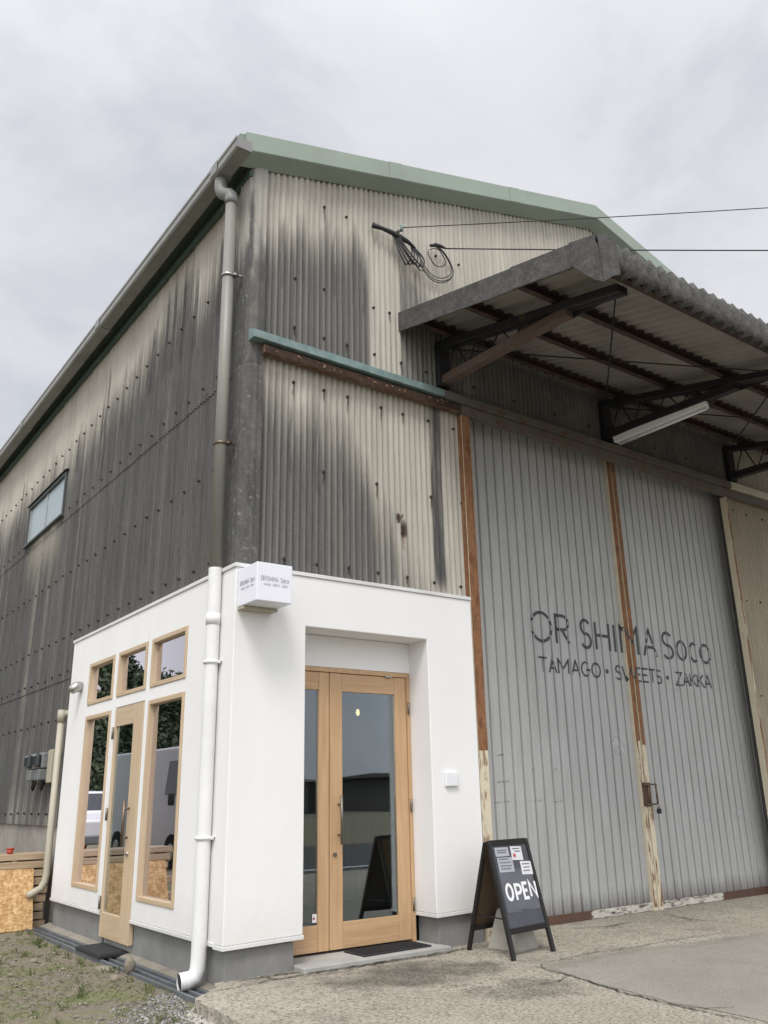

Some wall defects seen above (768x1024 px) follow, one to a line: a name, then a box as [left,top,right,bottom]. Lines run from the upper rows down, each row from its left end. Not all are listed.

water stain [0,201,394,827]
water stain [432,408,446,582]
peeling [592,806,724,919]